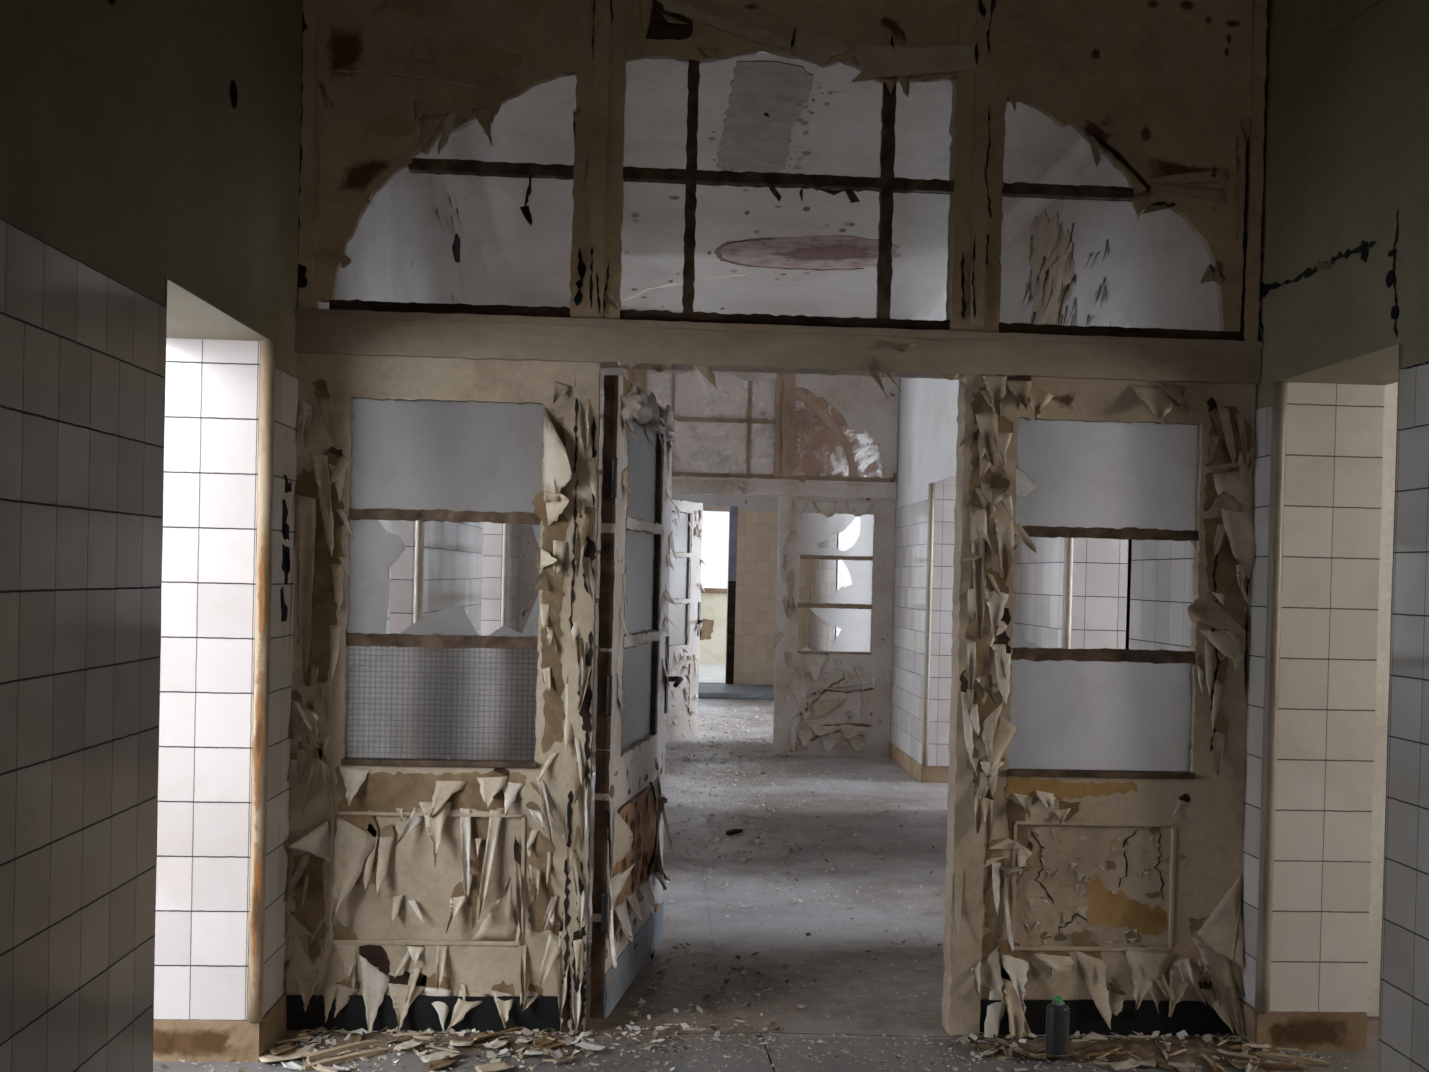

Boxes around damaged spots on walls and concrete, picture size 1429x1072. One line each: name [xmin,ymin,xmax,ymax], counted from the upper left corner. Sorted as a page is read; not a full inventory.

crack [297,19,305,308]
peeling [437,196,462,263]
peeling [520,173,532,225]
flaking render [709,61,839,192]
peeling [1089,117,1252,241]
crack [1240,0,1429,369]
peeling [259,379,606,1072]
peeling [617,362,714,737]
peeling [773,531,880,756]
peeling [792,498,876,518]
peeling [955,375,1311,1072]
peeling [605,758,788,1053]